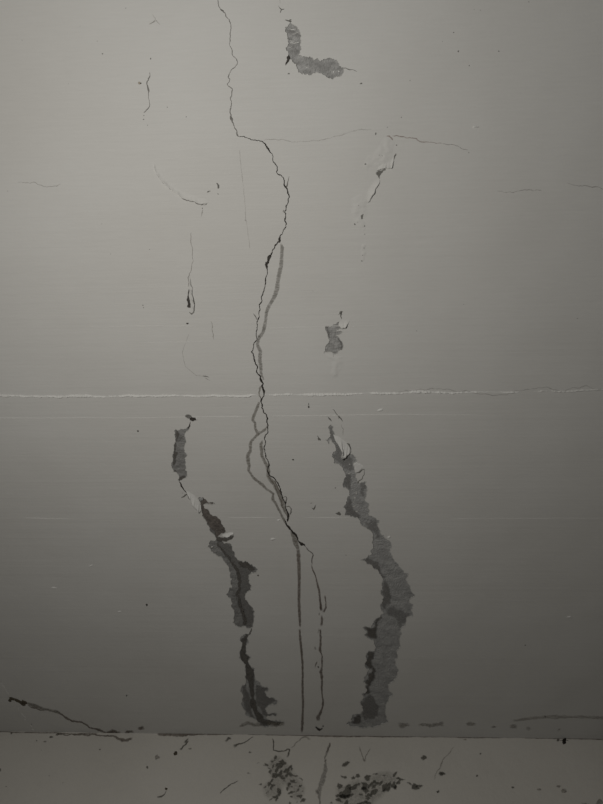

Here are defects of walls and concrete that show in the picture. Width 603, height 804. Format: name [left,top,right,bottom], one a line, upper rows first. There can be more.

peeling [279,7,357,79]
crack [218,2,314,563]
peeling [323,311,350,379]
peeling [171,415,285,728]
peeling [318,410,415,729]
crack [0,697,131,741]
crack [159,731,251,739]
crack [282,735,408,752]